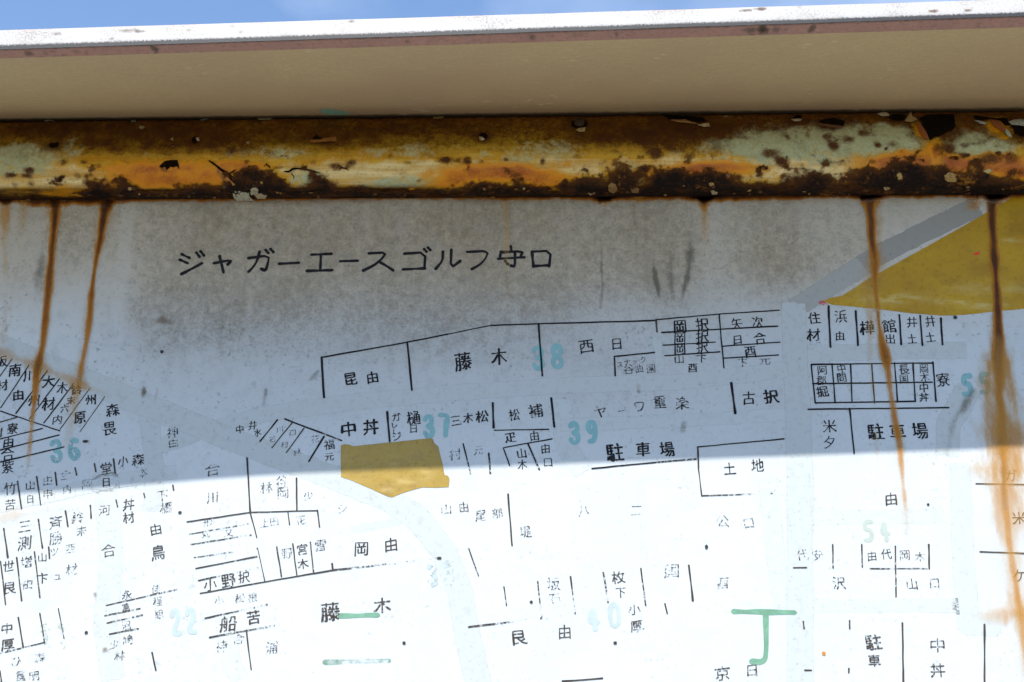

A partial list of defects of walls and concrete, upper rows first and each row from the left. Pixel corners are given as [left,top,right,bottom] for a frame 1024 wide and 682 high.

peeling [905,111,929,139]
peeling [975,119,1024,137]
peeling [233,188,279,201]
water stain [683,249,693,291]
corrosion [0,111,1024,636]